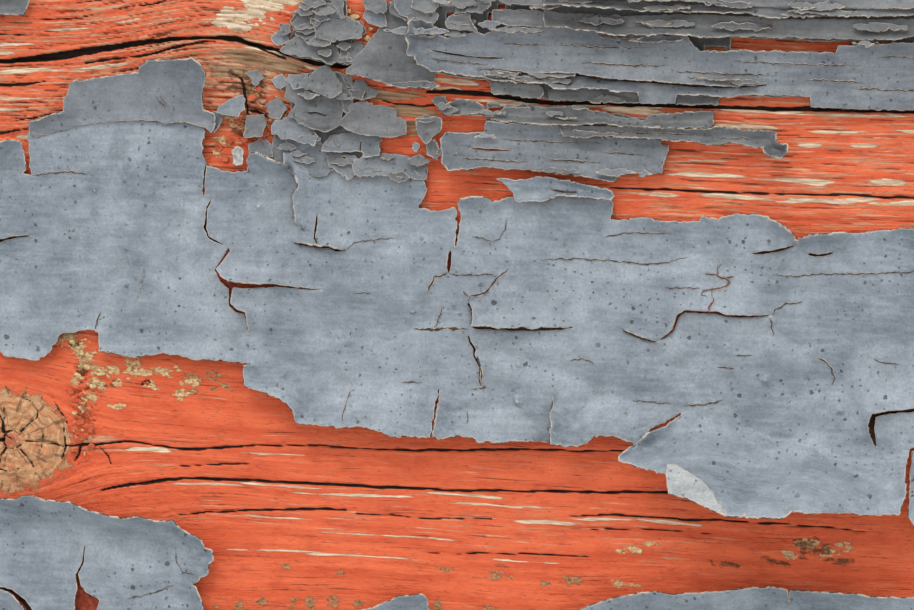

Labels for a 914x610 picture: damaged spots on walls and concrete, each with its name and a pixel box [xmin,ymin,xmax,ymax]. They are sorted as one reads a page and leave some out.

peeling [0,0,30,15]
crack [0,33,352,86]
peeling [240,0,914,183]
peeling [0,57,914,520]
crack [415,251,572,423]
crack [623,264,802,342]
crack [0,397,864,534]
crack [869,409,914,446]
peeling [0,494,214,610]
crack [0,587,32,610]
peeling [359,594,430,610]
peeling [579,586,914,610]